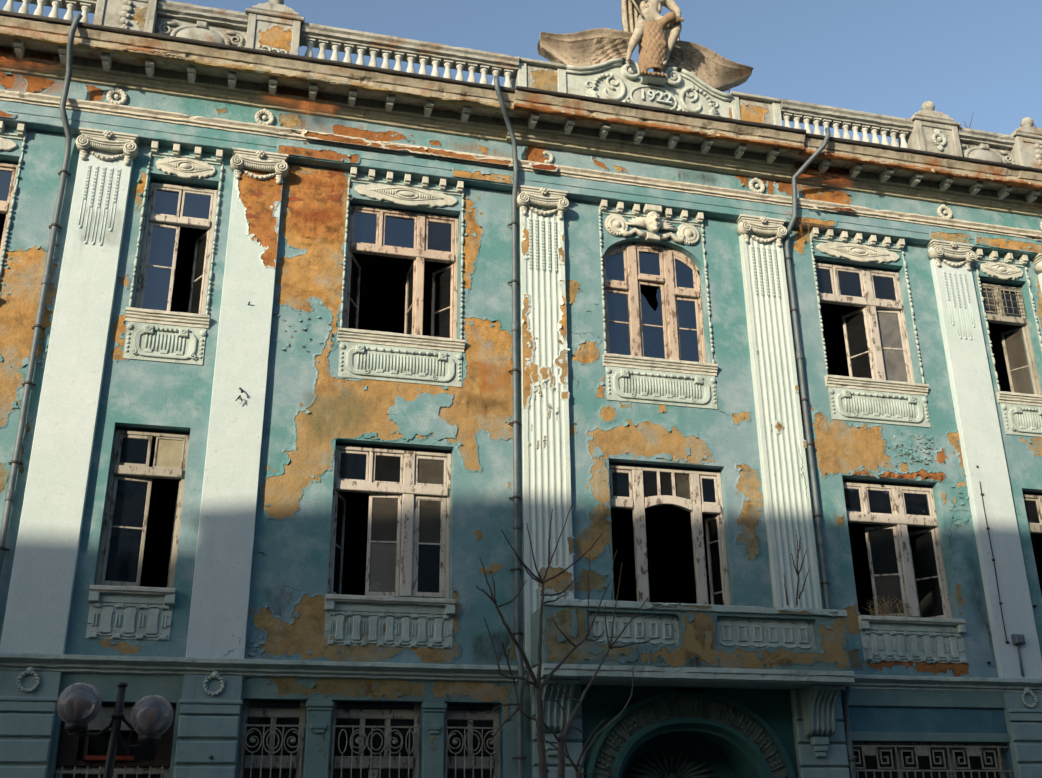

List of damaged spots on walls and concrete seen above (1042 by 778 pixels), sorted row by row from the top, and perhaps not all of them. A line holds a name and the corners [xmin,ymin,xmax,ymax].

peeling [0,72,57,94]
peeling [84,84,106,102]
flaking render [276,87,332,101]
peeling [528,67,569,93]
peeling [727,103,769,123]
peeling [929,230,1042,344]
peeling [0,244,61,429]
peeling [234,112,971,677]
peeling [0,419,34,500]
peeling [1018,435,1042,459]
peeling [266,677,514,722]